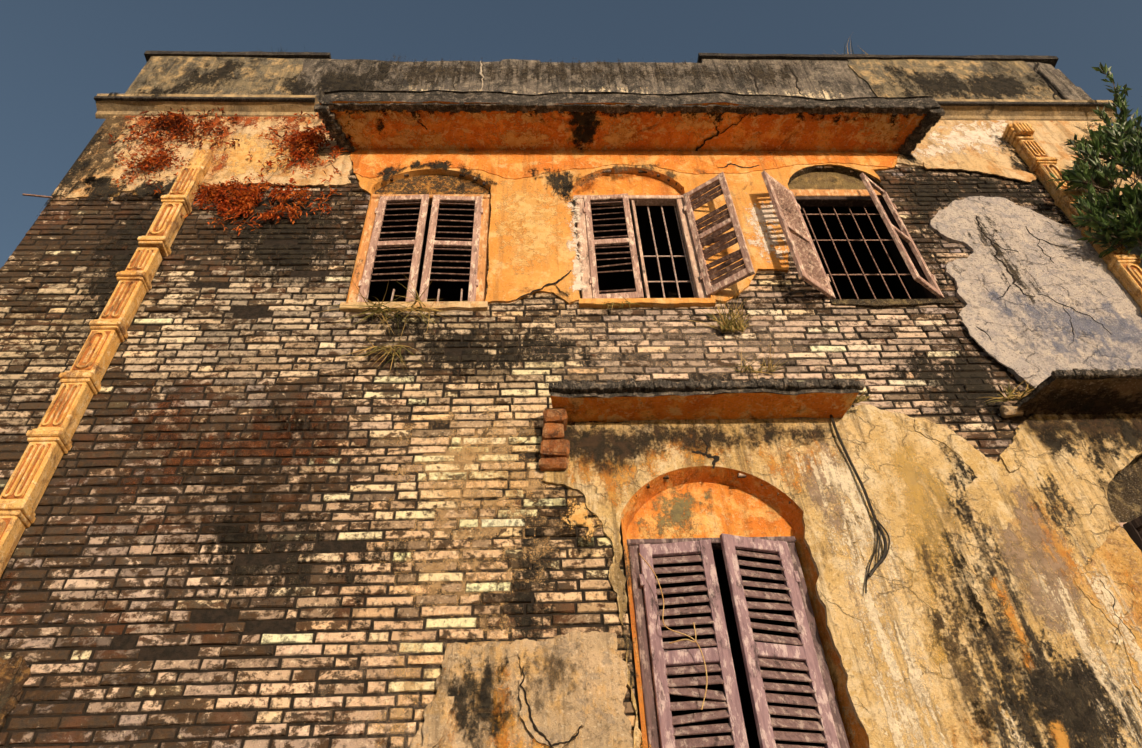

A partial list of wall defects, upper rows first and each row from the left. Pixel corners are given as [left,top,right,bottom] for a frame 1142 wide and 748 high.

peeling [198,133,325,189]
damp [337,109,454,145]
damp [266,56,845,102]
damp [559,111,773,150]
crack [695,65,761,168]
peeling [885,120,1142,389]
crack [976,204,1111,345]
peeling [913,418,1027,483]
flaking render [562,489,610,558]
damp [564,421,1142,748]
damp [447,511,586,748]
crack [519,666,582,747]